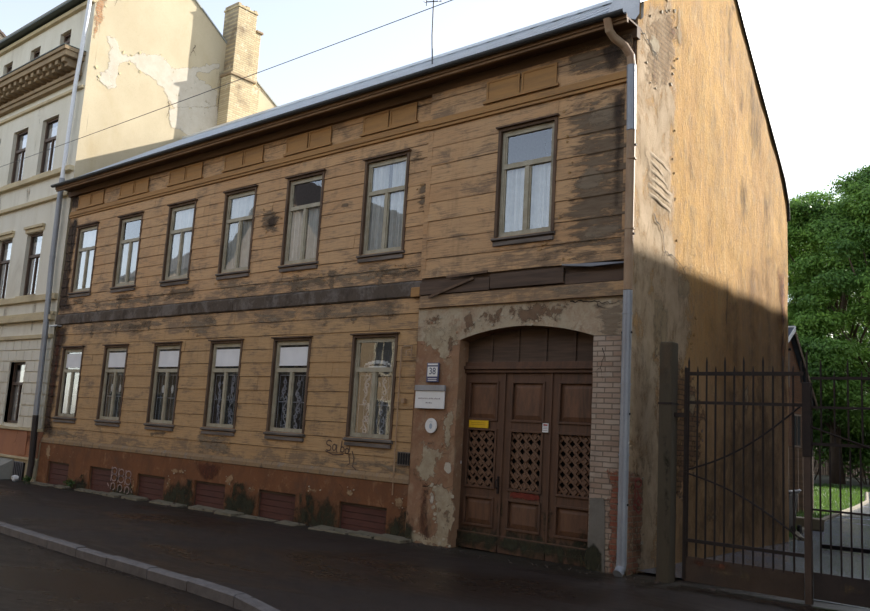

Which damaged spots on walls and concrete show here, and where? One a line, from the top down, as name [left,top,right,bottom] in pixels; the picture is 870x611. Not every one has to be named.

flaking render [94,0,107,38]
flaking render [95,35,220,135]
flaking render [421,302,568,361]
flaking render [536,0,705,576]
flaking render [316,411,455,547]